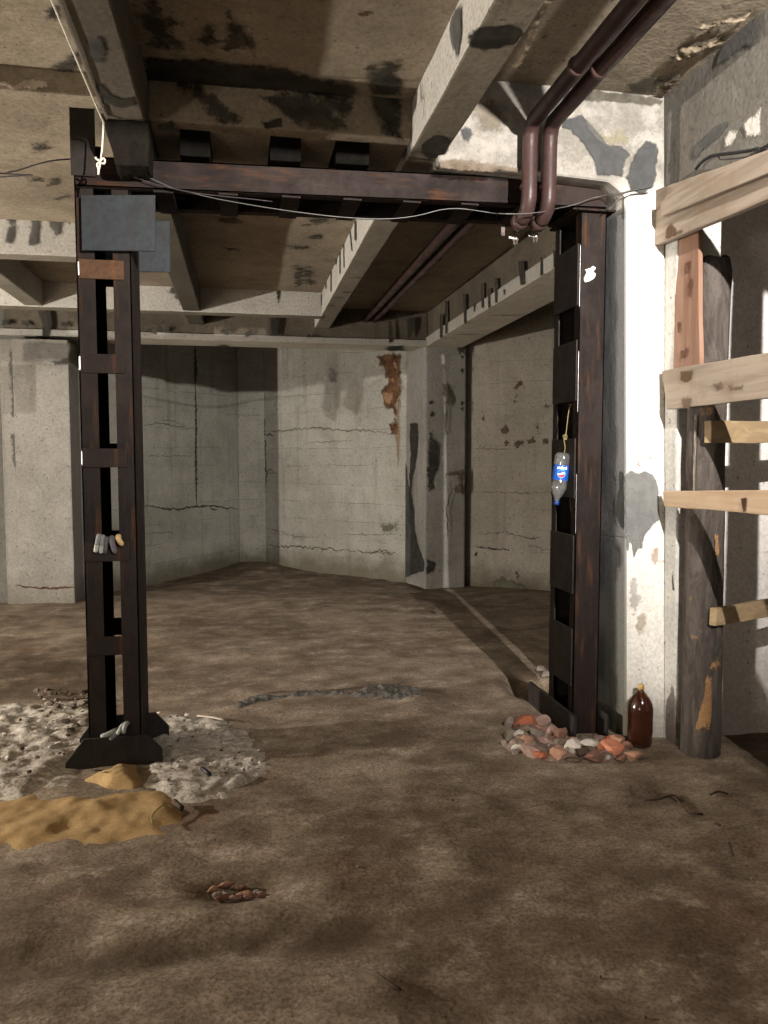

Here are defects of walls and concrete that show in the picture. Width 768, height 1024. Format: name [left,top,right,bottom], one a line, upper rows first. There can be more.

water stain [141,0,522,172]
peeling [659,12,758,93]
crack [264,398,394,492]
corrosion [377,353,402,455]
crack [266,527,397,555]
water stain [380,423,439,578]